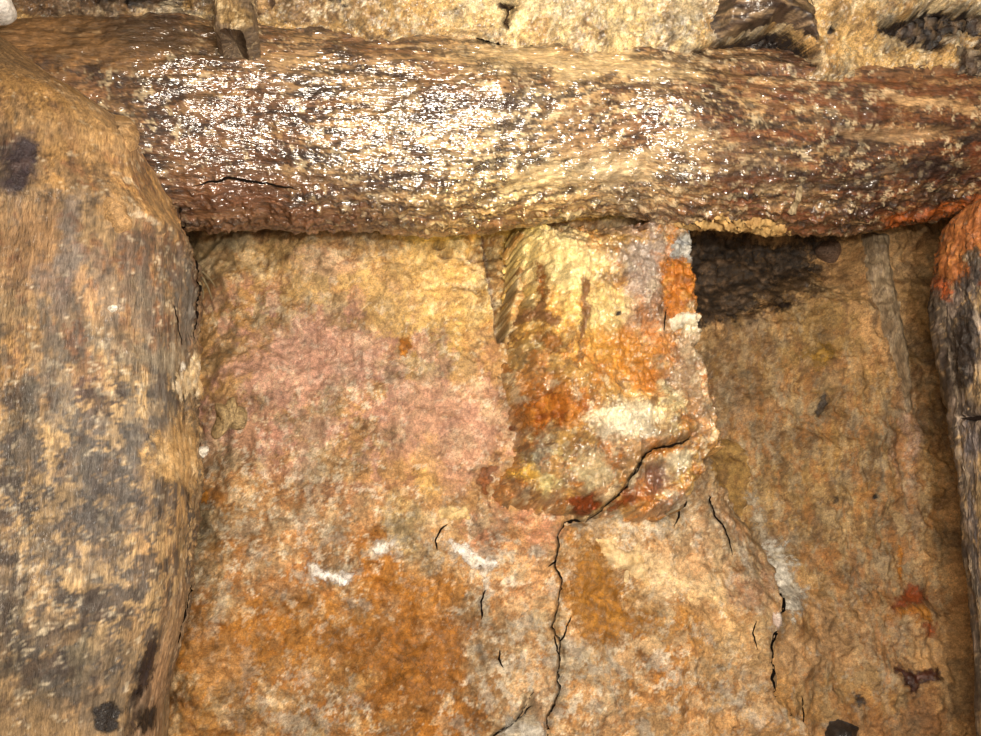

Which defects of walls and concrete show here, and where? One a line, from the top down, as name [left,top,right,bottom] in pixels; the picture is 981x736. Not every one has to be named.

corrosion [880,193,981,300]
corrosion [661,257,702,332]
corrosion [509,390,588,436]
corrosion [569,493,634,517]
crack [674,496,733,555]
crack [479,590,487,619]
crack [493,434,694,736]
crack [752,593,805,722]